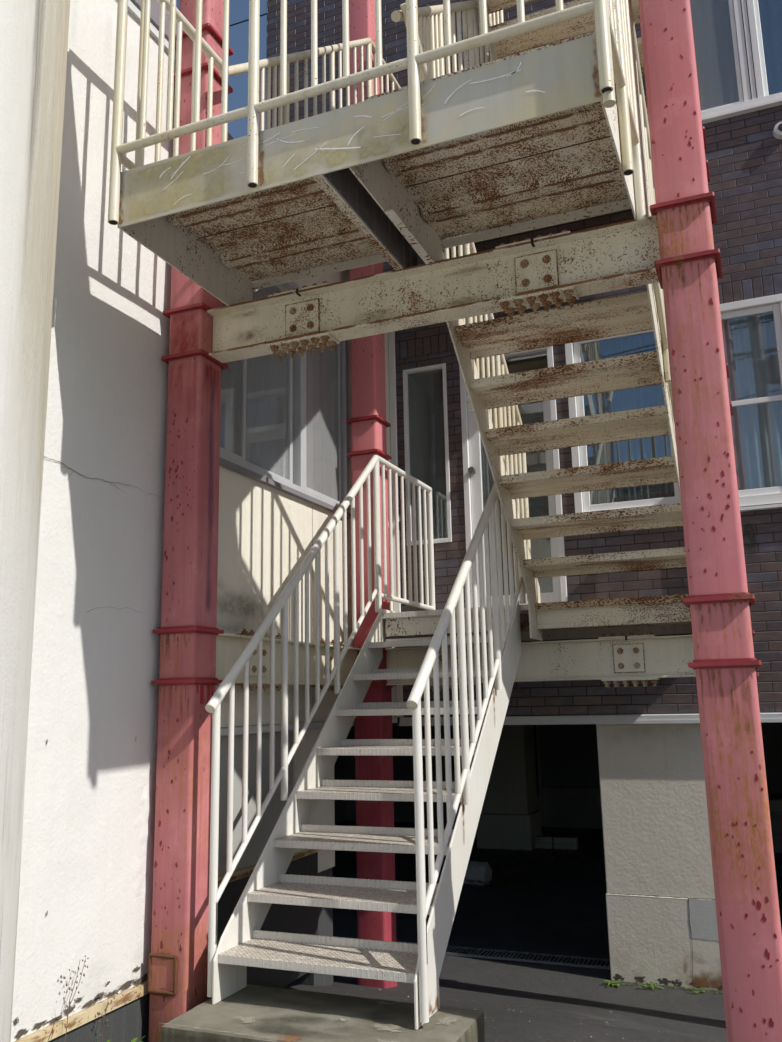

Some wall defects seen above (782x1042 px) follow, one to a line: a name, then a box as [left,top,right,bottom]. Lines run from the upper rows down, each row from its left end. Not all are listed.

corrosion [397,114,598,171]
corrosion [180,152,325,226]
corrosion [474,170,617,212]
corrosion [229,229,367,268]
corrosion [390,219,636,272]
corrosion [214,275,374,310]
corrosion [369,297,500,324]
corrosion [516,269,650,296]
corrosion [213,325,356,354]
peeling [14,966,148,1039]
water stain [238,1016,318,1034]